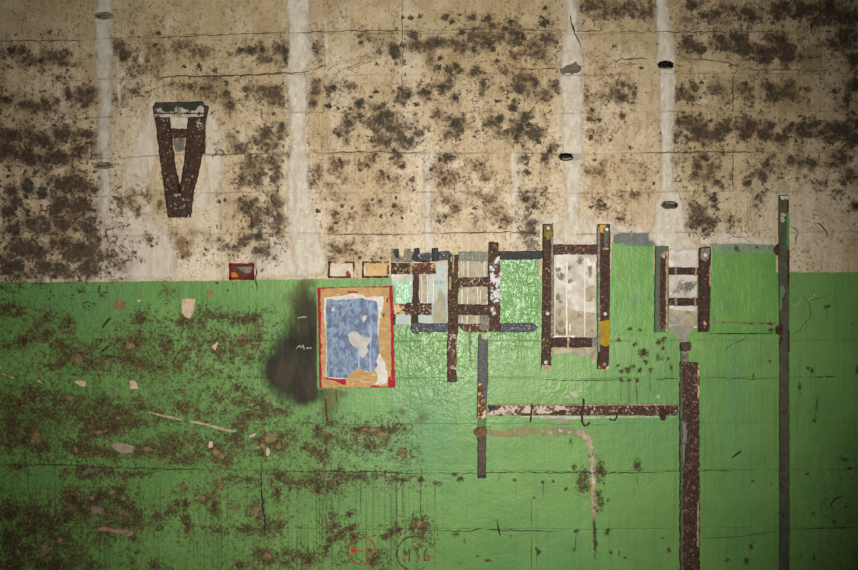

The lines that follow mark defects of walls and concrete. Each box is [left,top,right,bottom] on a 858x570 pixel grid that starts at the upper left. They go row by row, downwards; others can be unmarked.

damp [0,5,661,328]
damp [577,0,657,30]
damp [650,0,858,245]
peeling [0,285,440,570]
rust [616,257,673,394]